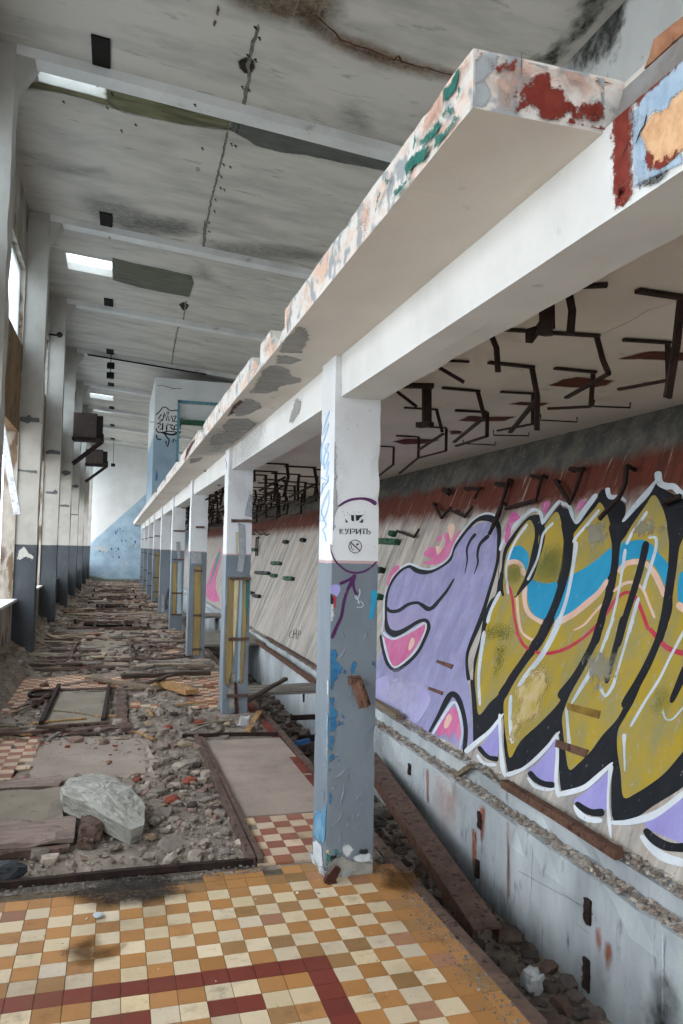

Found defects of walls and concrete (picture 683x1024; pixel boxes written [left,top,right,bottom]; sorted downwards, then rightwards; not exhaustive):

crack [202,131,228,247]
crack [242,24,260,105]
crack [316,15,452,75]
peeling [362,69,460,222]
peeling [475,49,605,130]
leakage [537,0,626,66]
peeling [618,61,683,198]
crack [158,300,187,389]
peeling [211,319,309,445]
peeling [313,790,373,877]
corrosion [473,808,484,878]
corrosion [597,931,611,962]